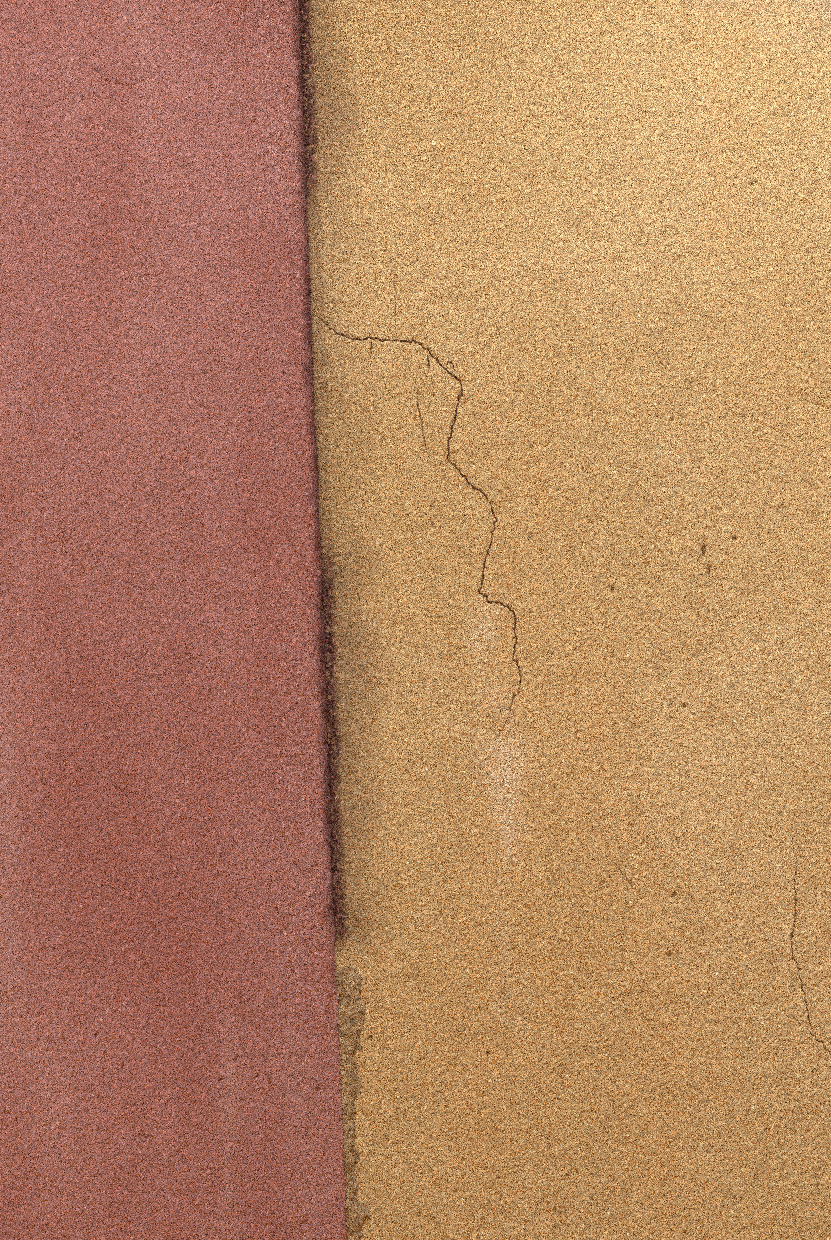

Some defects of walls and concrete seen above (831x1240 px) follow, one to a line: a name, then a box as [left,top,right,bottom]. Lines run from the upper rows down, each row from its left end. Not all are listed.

crack [317,316,522,741]